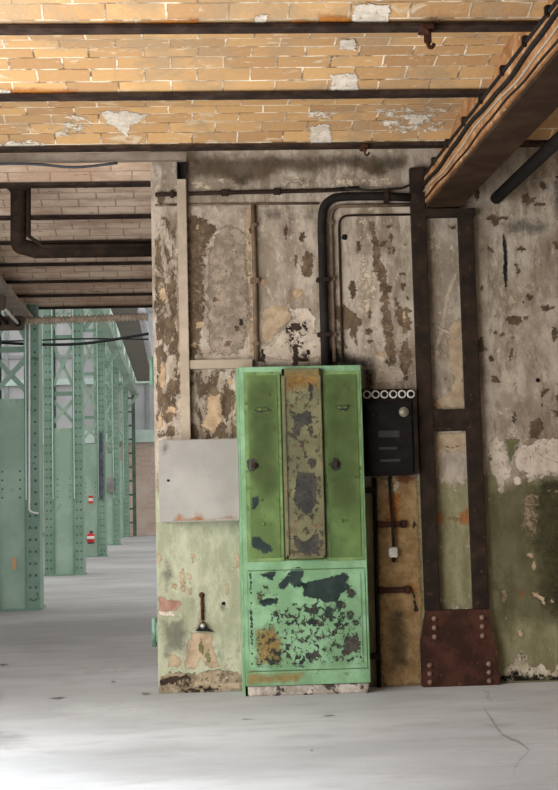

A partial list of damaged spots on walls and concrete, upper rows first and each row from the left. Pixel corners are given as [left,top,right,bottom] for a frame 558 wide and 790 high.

peeling [50,115,91,137]
peeling [99,110,149,137]
peeling [375,106,448,134]
peeling [154,209,321,439]
peeling [487,418,558,494]
peeling [520,490,558,538]
damp [536,483,558,615]
flaking render [158,597,181,617]